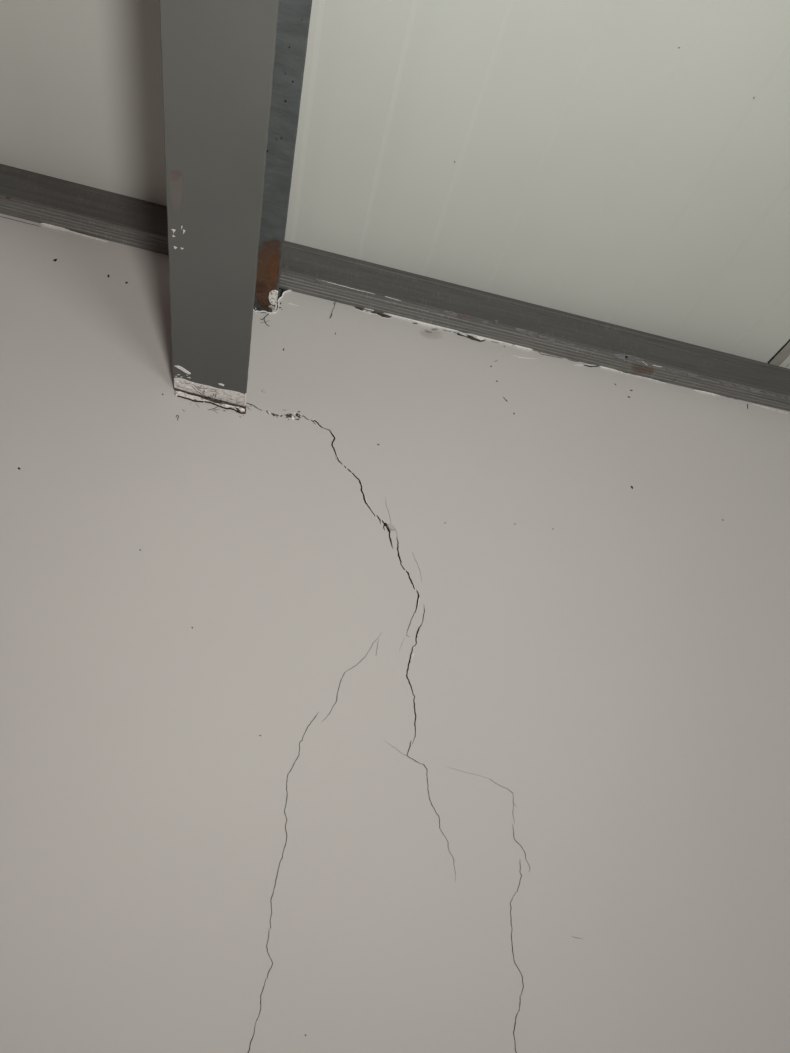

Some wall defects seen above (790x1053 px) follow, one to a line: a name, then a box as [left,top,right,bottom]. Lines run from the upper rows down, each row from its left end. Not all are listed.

corrosion [255,241,280,309]
crack [248,415,456,1053]
crack [456,769,530,1053]